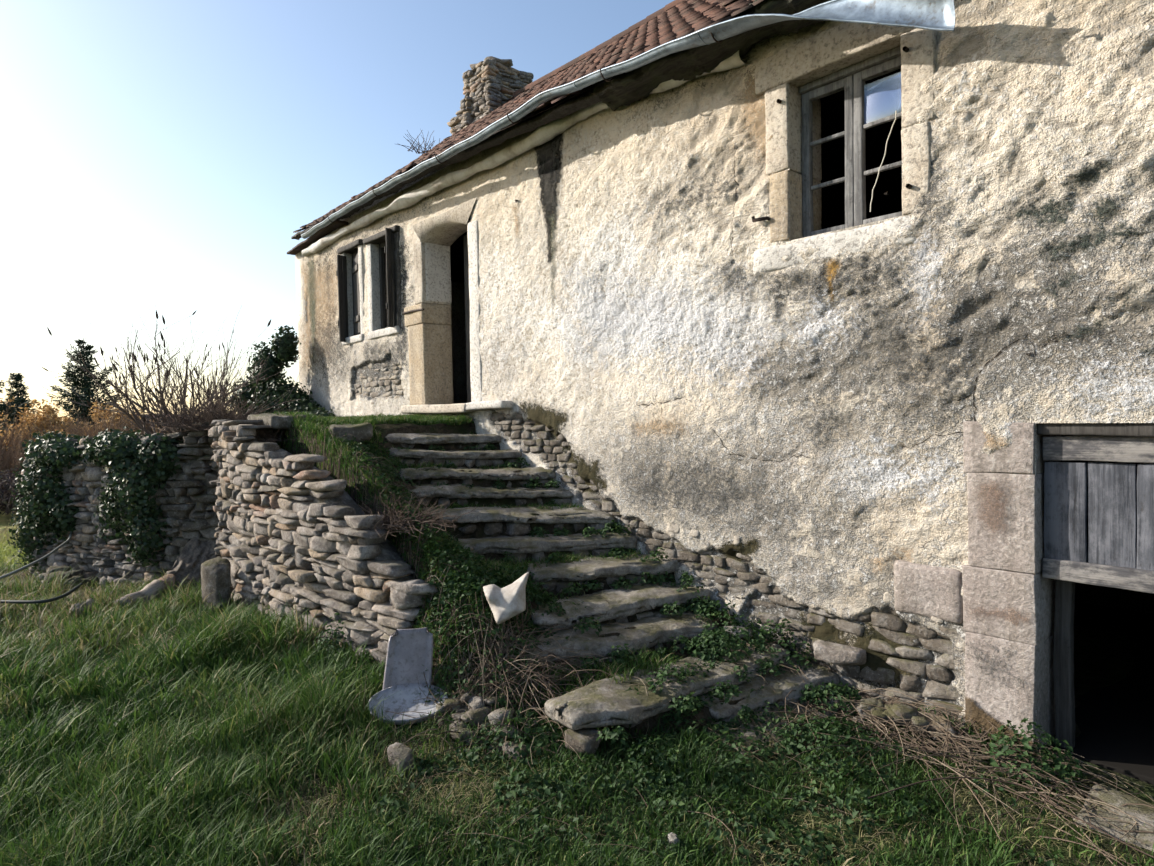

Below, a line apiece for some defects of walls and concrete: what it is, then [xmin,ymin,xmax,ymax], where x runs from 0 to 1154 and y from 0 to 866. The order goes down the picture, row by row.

spalling [351,349,404,404]
water stain [534,133,1056,424]
crack [903,339,1059,448]
spalling [484,411,964,725]